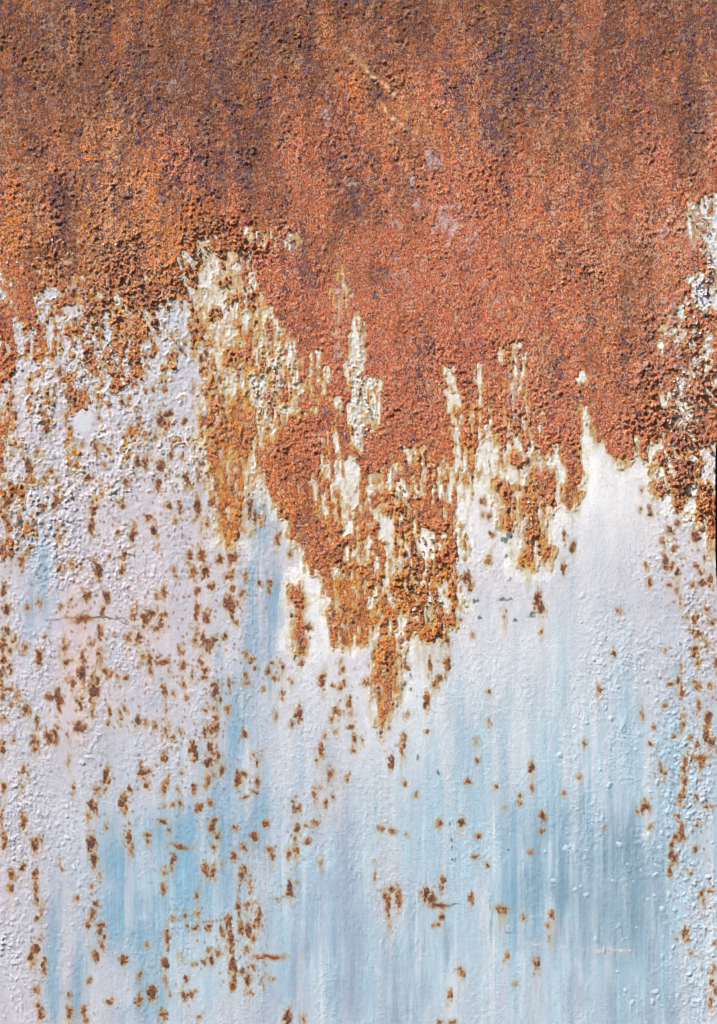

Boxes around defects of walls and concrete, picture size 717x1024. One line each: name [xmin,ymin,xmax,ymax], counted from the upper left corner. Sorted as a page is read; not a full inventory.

peeling [6,218,159,273]
peeling [673,215,717,338]
peeling [43,326,143,406]
corrosion [0,0,717,819]
peeling [654,356,704,486]
peeling [397,484,442,622]
peeling [501,478,546,557]
corrosion [85,835,105,962]
corrosion [133,796,319,1020]
corrosion [419,875,446,927]
corrosion [667,814,697,877]
corrosion [27,938,47,1020]